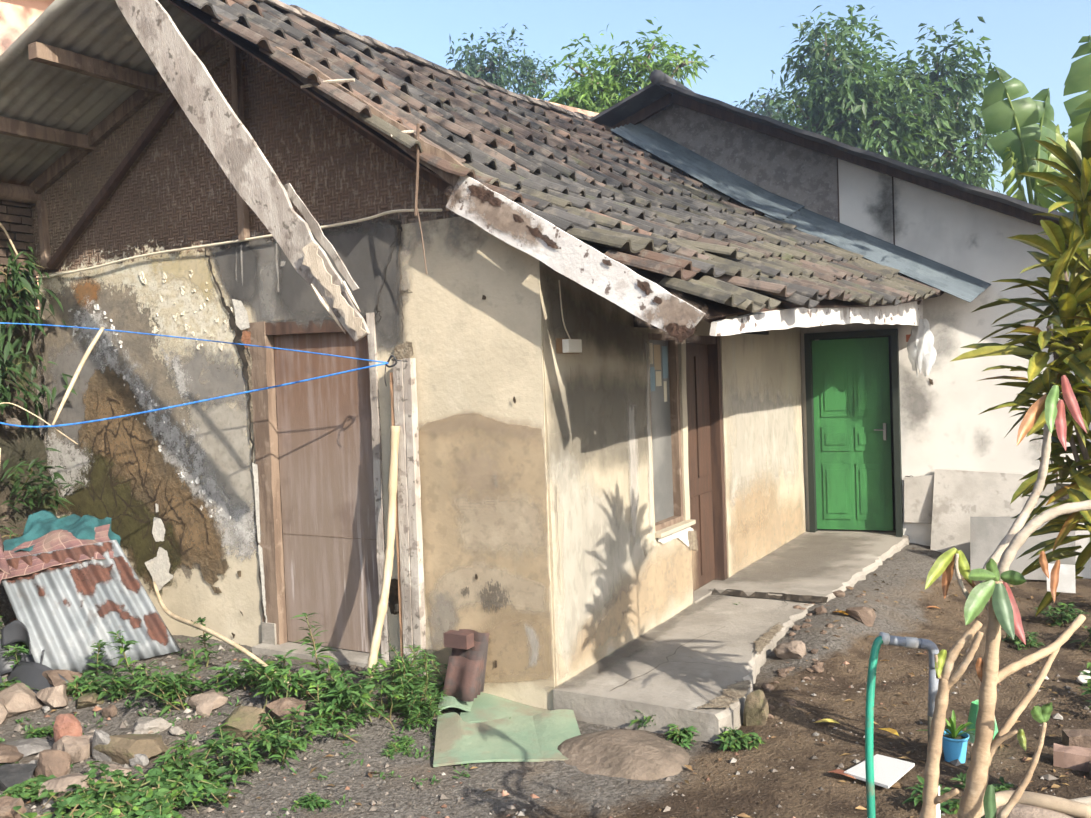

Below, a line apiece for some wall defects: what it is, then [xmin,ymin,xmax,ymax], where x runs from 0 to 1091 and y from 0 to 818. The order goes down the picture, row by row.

peeling [36,240,254,595]
crack [205,248,266,623]
flaking render [252,463,267,623]
damp [419,275,721,686]
damp [903,372,929,420]